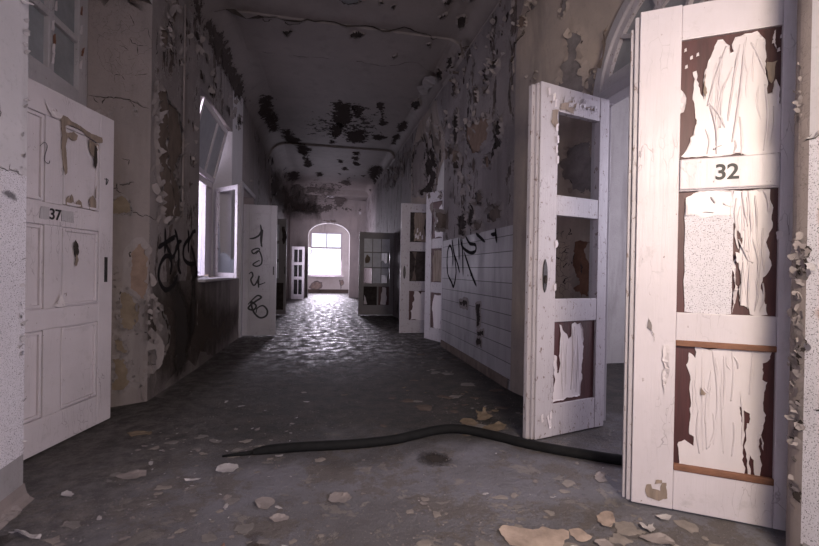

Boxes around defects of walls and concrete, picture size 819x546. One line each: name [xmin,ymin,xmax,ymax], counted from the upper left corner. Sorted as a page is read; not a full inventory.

peeling [56,110,103,175]
peeling [66,185,99,211]
peeling [151,80,199,225]
peeling [159,0,243,131]
spalling [548,0,597,199]
peeling [680,30,782,158]
peeling [792,62,803,123]
spalling [111,237,171,394]
peeling [541,323,584,429]
peeling [677,347,772,476]
peeling [730,189,816,462]
peeling [787,474,802,509]